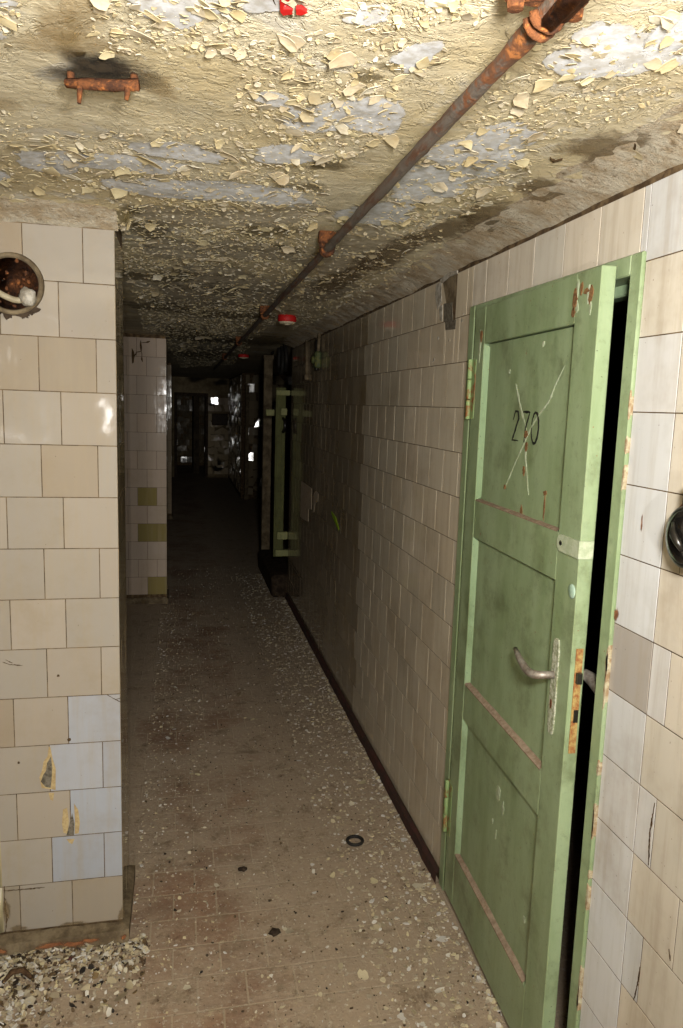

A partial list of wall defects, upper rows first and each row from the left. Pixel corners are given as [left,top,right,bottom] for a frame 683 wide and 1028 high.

peeling [0,0,683,368]
spalling [39,747,56,801]
spalling [62,804,80,844]